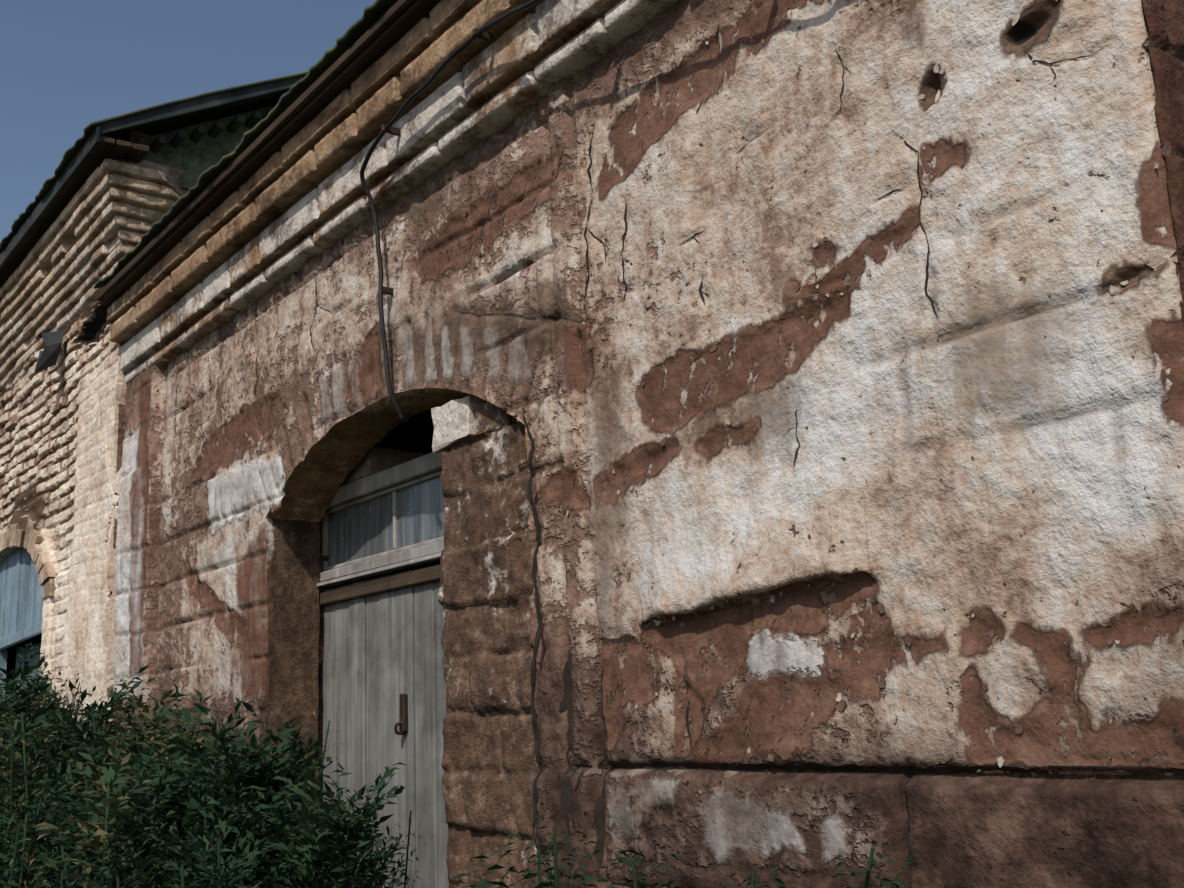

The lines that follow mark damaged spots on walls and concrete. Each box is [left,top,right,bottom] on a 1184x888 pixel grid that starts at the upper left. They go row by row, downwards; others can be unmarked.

crack [454,119,633,325]
peeling [596,0,830,200]
crack [873,131,938,323]
spalling [917,62,947,110]
peeling [918,136,971,182]
spalling [999,0,1063,59]
crack [1023,43,1110,87]
peeling [1097,141,1176,295]
peeling [533,204,921,516]
peeling [1145,314,1184,426]
crack [522,408,1184,888]
peeling [601,569,1184,779]